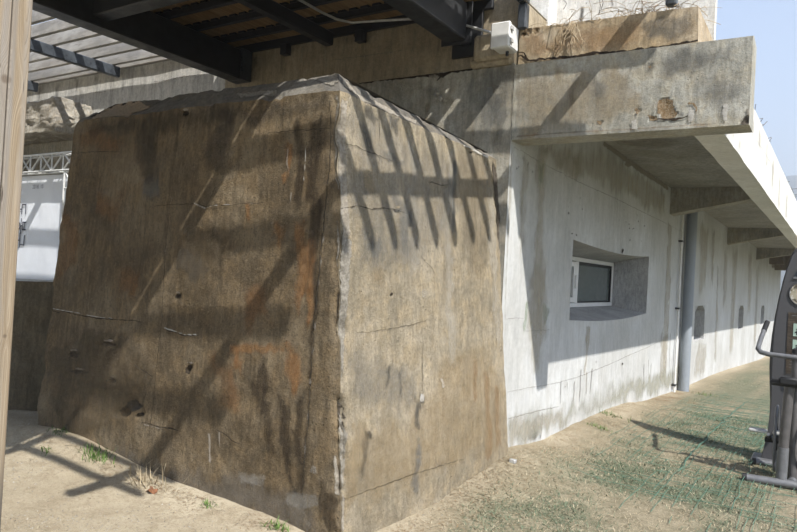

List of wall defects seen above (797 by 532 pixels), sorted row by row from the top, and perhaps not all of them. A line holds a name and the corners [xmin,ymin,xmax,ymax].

crack [518,39,698,62]
crack [359,67,491,84]
spalling [648,98,697,122]
crack [269,100,408,493]
crack [360,320,426,389]
damp [194,477,309,526]